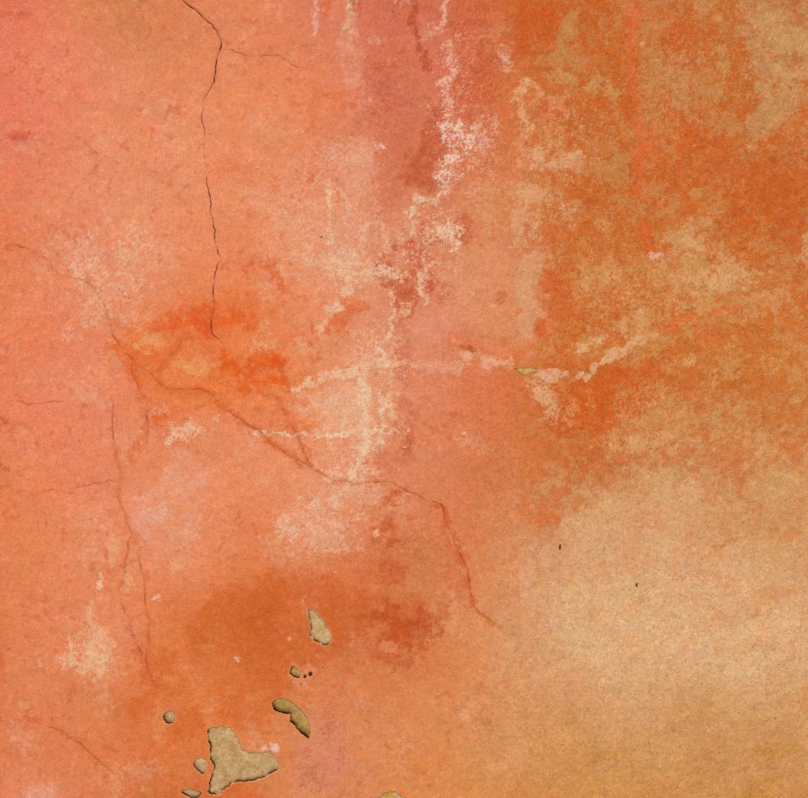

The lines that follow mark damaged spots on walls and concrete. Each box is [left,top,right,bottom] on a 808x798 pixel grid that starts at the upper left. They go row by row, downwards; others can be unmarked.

crack [180,0,305,344]
crack [32,393,159,687]
spalling [160,708,178,727]
spalling [178,723,282,798]
crack [0,238,505,630]
spalling [269,695,313,741]
damp [25,0,568,798]
spalling [287,664,315,689]
spalling [305,607,334,648]
damp [502,366,808,716]